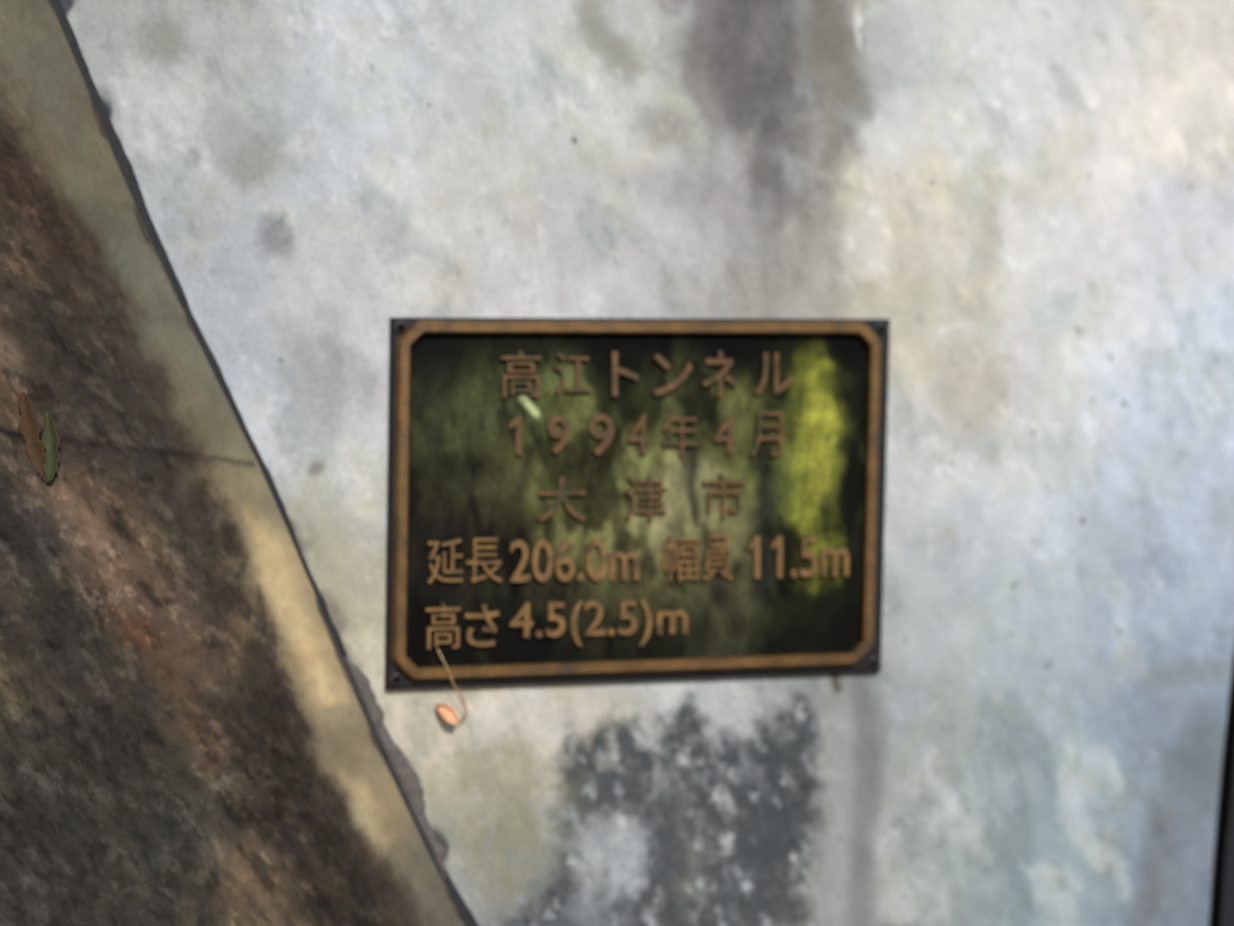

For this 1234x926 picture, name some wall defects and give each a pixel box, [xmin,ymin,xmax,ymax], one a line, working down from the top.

water stain [560,0,896,319]